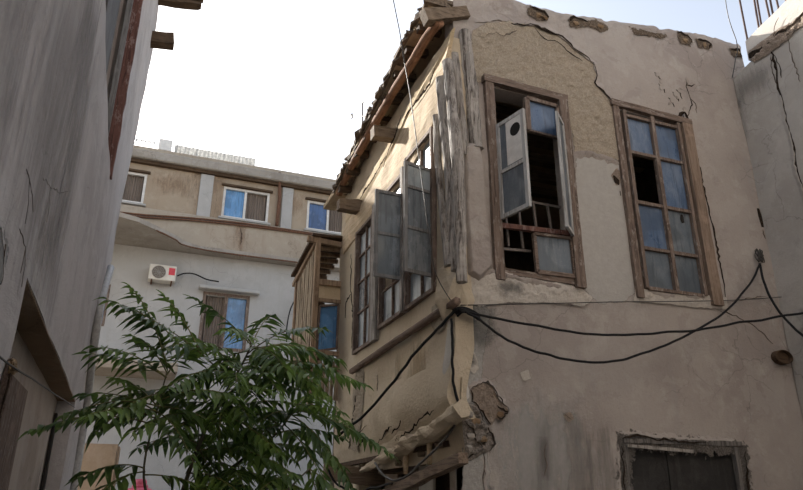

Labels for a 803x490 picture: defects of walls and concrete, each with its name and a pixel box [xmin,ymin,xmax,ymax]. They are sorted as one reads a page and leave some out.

crack [361,69,435,197]
flaking render [471,5,619,165]
spalling [629,26,667,39]
crack [678,83,697,118]
spalling [677,31,712,50]
crack [770,17,803,203]
peeling [0,215,9,289]
crack [0,169,71,287]
crack [698,158,773,344]
crack [358,410,434,447]
spalling [462,353,511,461]
spalling [615,429,753,490]